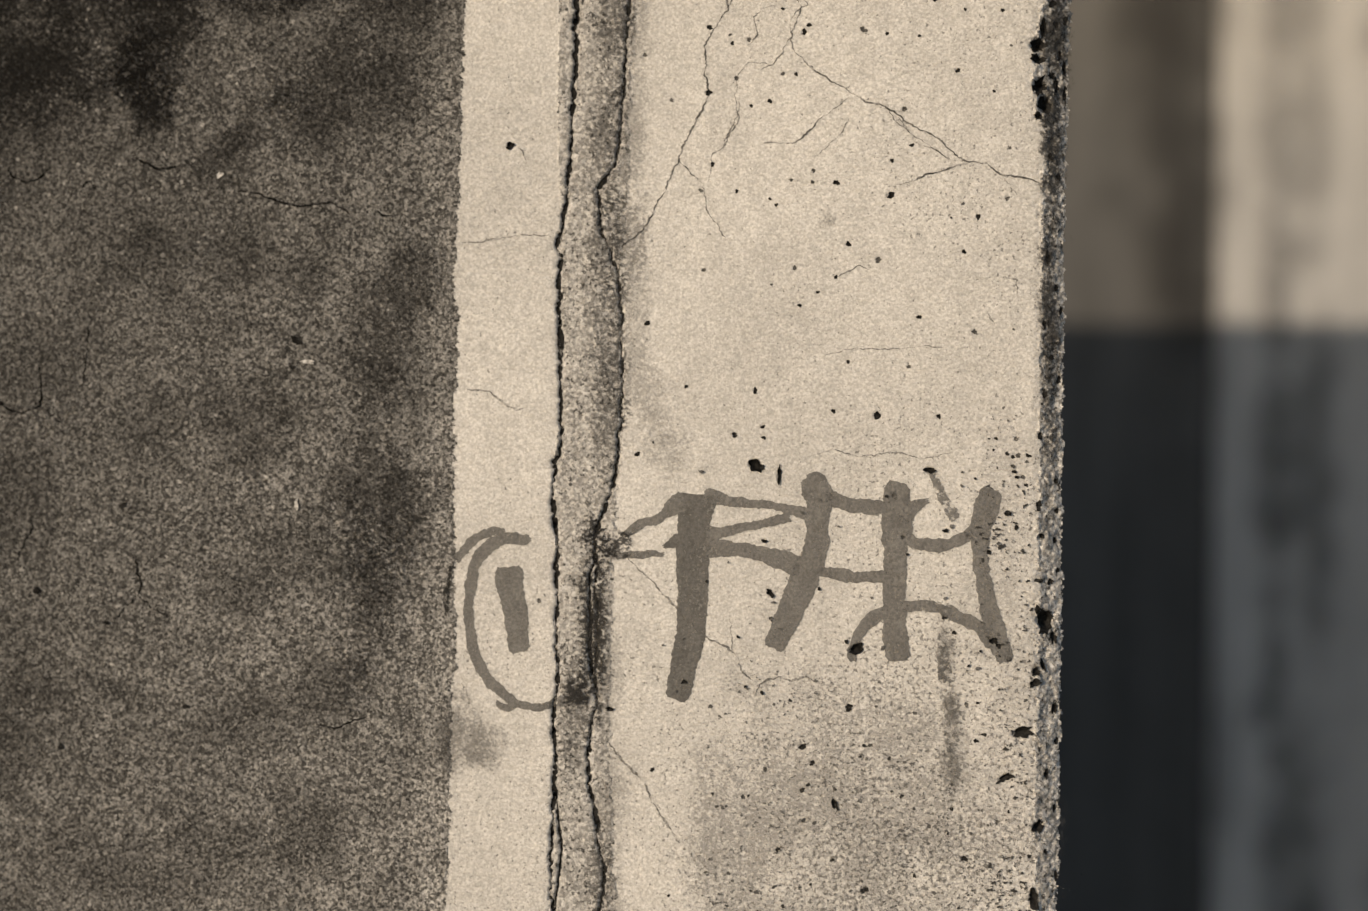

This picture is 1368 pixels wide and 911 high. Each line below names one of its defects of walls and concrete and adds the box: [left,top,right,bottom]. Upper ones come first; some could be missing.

damp [0,0,311,176]
crack [464,0,1039,911]